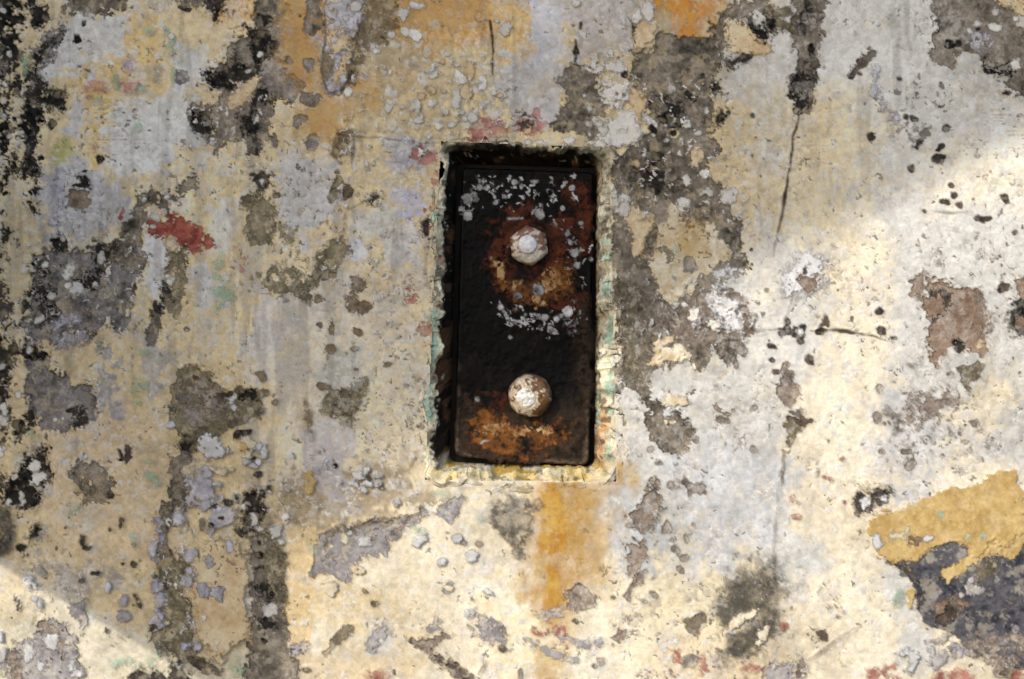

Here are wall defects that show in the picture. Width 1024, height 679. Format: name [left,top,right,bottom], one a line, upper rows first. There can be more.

peeling [928,0,1024,97]
crack [780,118,799,220]
peeling [904,114,950,165]
corrosion [462,179,597,466]
crack [748,307,897,340]
peeling [909,273,1024,392]
peeling [16,522,43,552]
peeling [78,363,278,676]
peeling [242,447,479,679]
peeling [464,607,508,645]
corrosion [533,483,580,621]
peeling [867,469,1024,679]